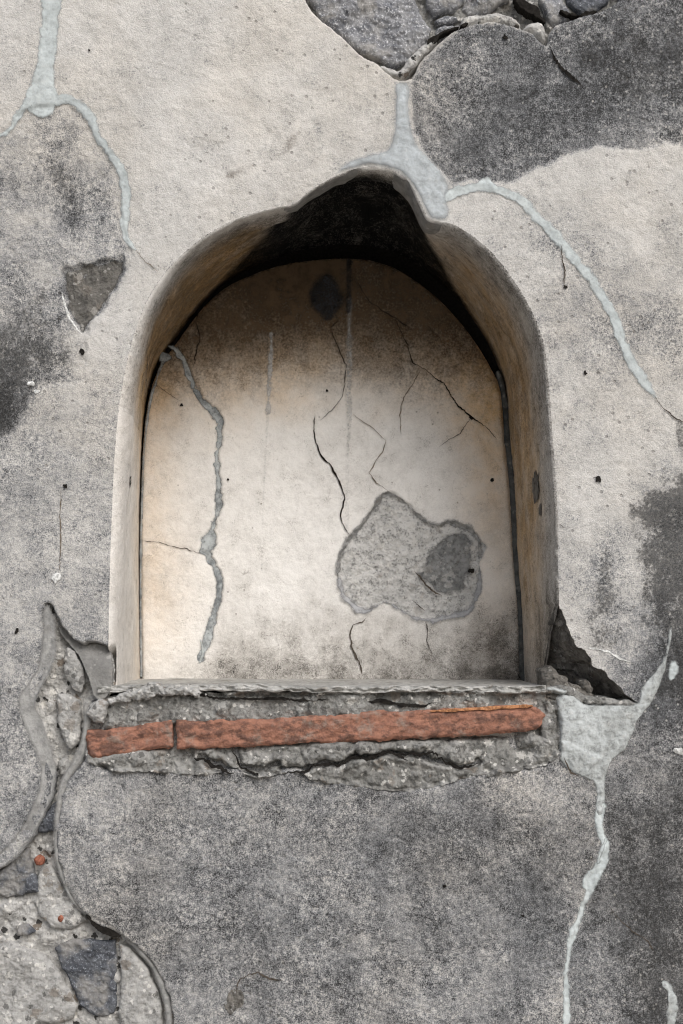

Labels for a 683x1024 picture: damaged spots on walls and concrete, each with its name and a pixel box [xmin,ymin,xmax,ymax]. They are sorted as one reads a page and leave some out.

crack [145,311,224,663]
crack [313,319,349,534]
crack [358,283,496,489]
flaking render [336,491,486,624]
flaking render [59,626,114,699]
crack [349,618,366,673]
peeling [430,704,533,712]
flaking render [535,604,638,706]